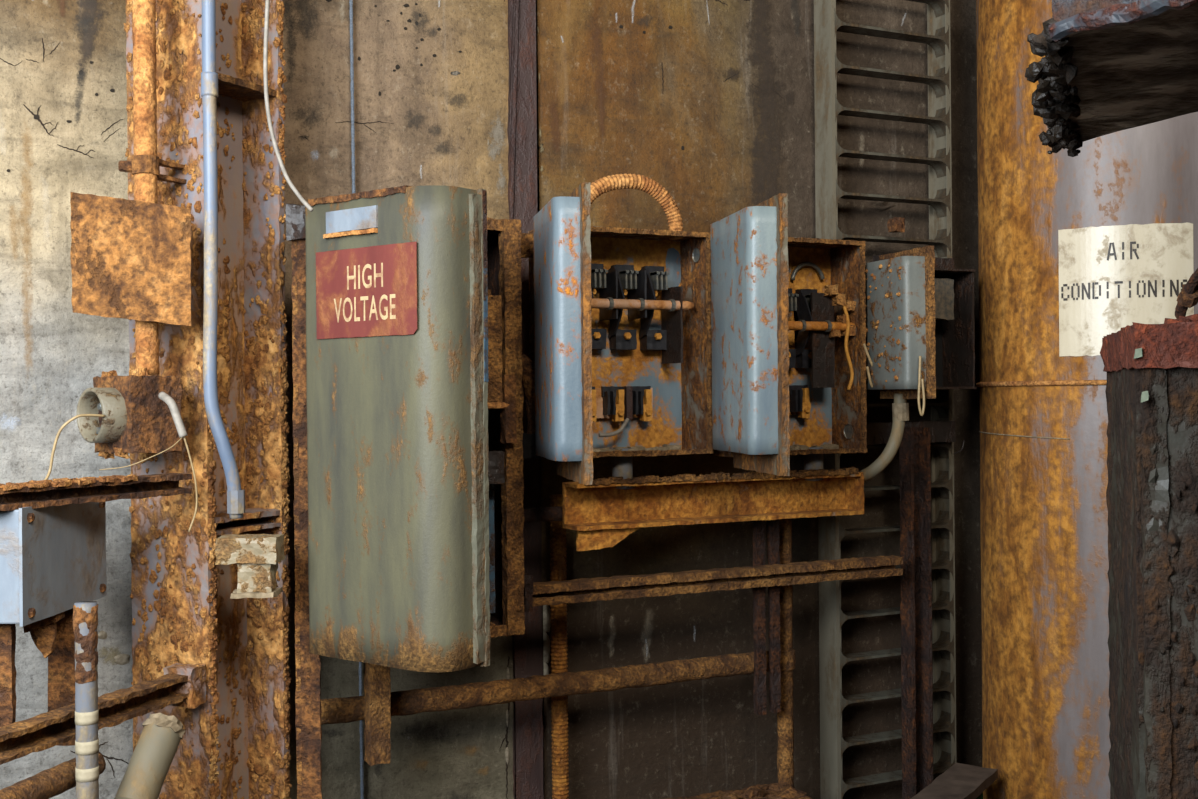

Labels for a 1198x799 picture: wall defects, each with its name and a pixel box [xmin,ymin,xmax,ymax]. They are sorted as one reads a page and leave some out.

crack [0,38,59,66]
crack [23,104,123,158]
damp [60,0,103,120]
damp [725,0,794,205]
rust [0,0,292,799]